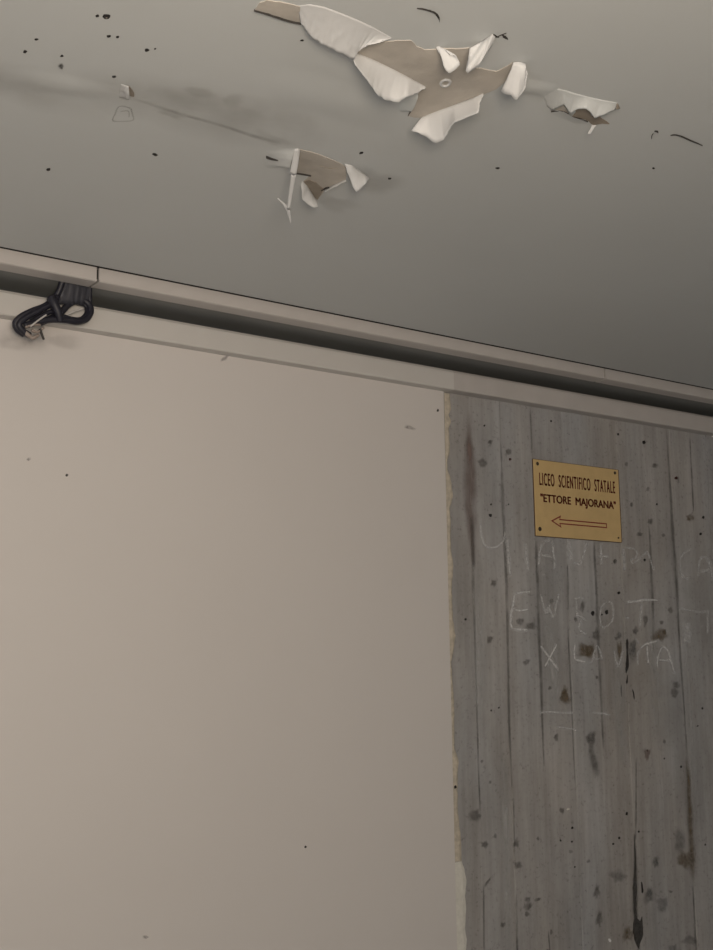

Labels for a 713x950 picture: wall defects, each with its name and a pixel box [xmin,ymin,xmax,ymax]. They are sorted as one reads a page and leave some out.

peeling [254,0,528,143]
peeling [544,89,620,135]
peeling [262,148,370,224]